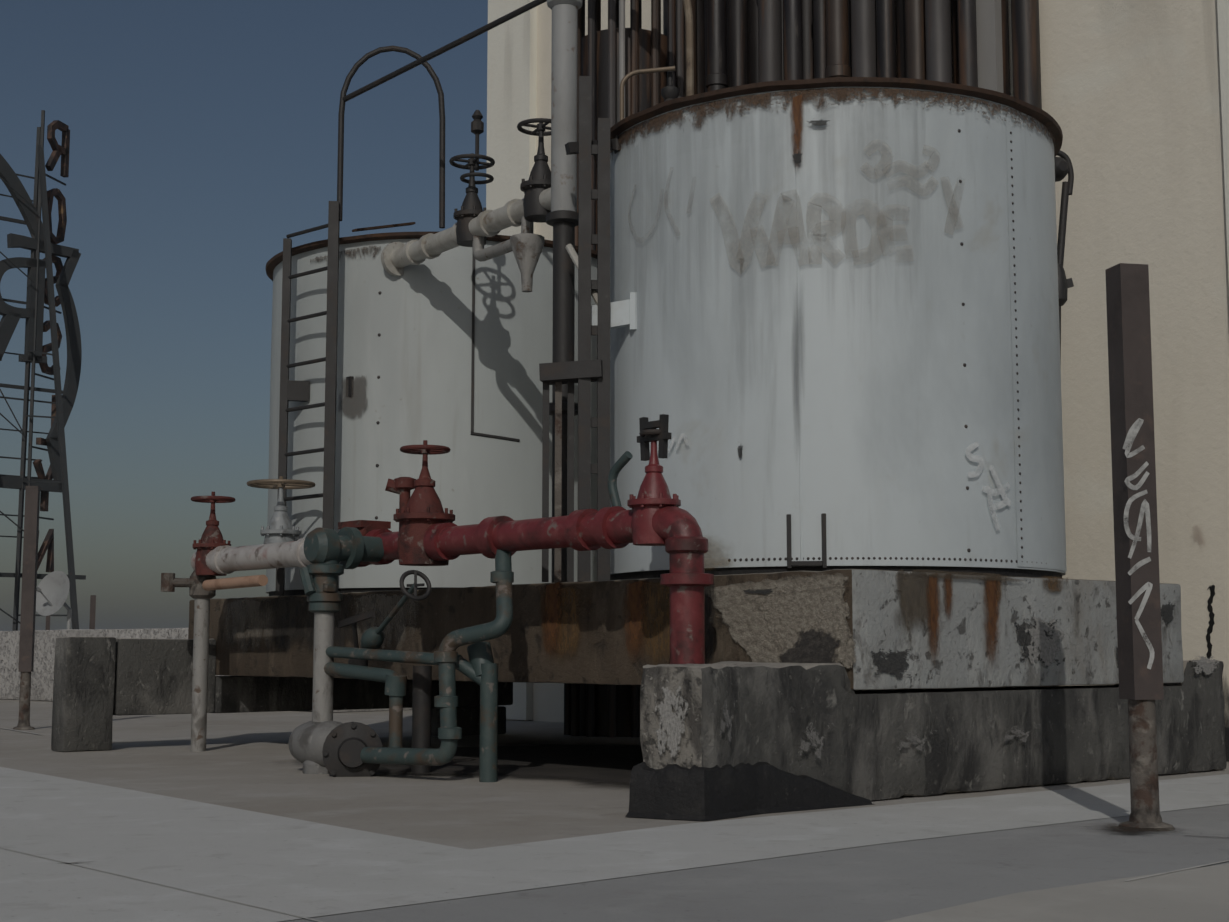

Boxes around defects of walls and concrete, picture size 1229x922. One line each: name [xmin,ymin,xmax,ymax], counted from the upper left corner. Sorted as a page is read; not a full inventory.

rust [610,88,1056,164]
spalling [711,573,856,668]
peeling [871,648,917,682]
rust [897,570,952,656]
rust [984,580,1006,658]
peeling [1014,616,1065,673]
peeling [1161,598,1175,631]
crack [1206,585,1215,659]